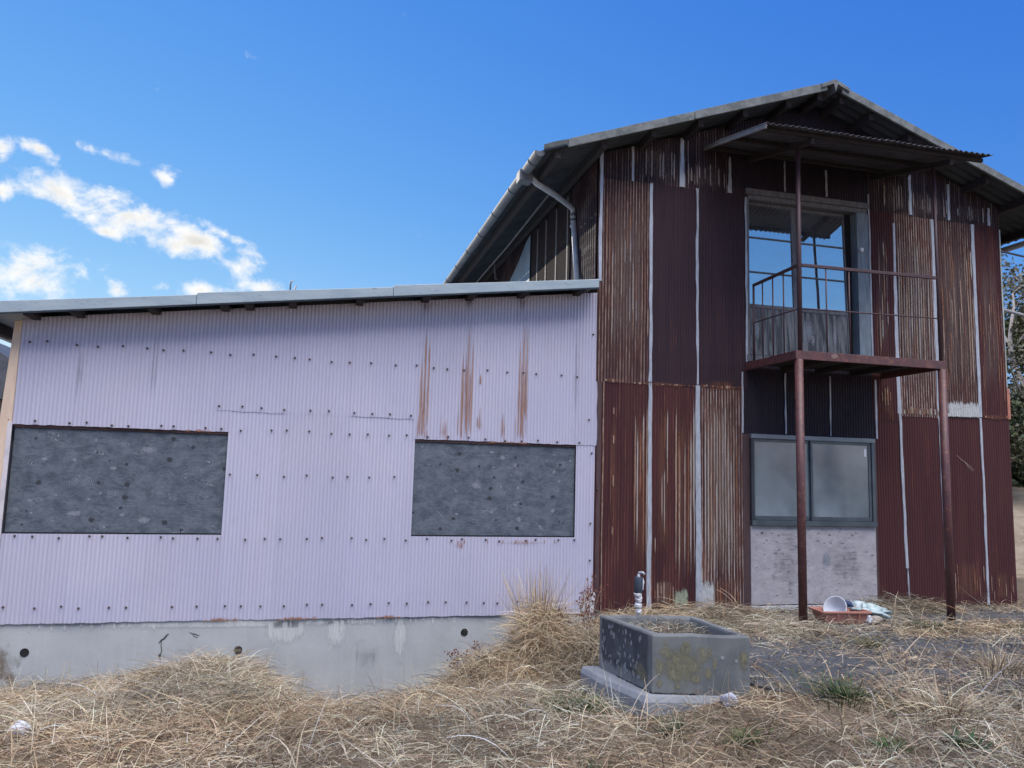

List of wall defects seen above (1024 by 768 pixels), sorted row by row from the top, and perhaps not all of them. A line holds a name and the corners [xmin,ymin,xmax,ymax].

rust [646,151,675,179]
rust [688,162,725,188]
rust [884,185,984,223]
rust [606,199,648,334]
rust [879,243,1005,396]
rust [417,337,430,439]
rust [445,332,481,440]
rust [502,330,528,444]
peeling [948,401,979,417]
rust [634,406,739,604]
damp [28,616,456,655]